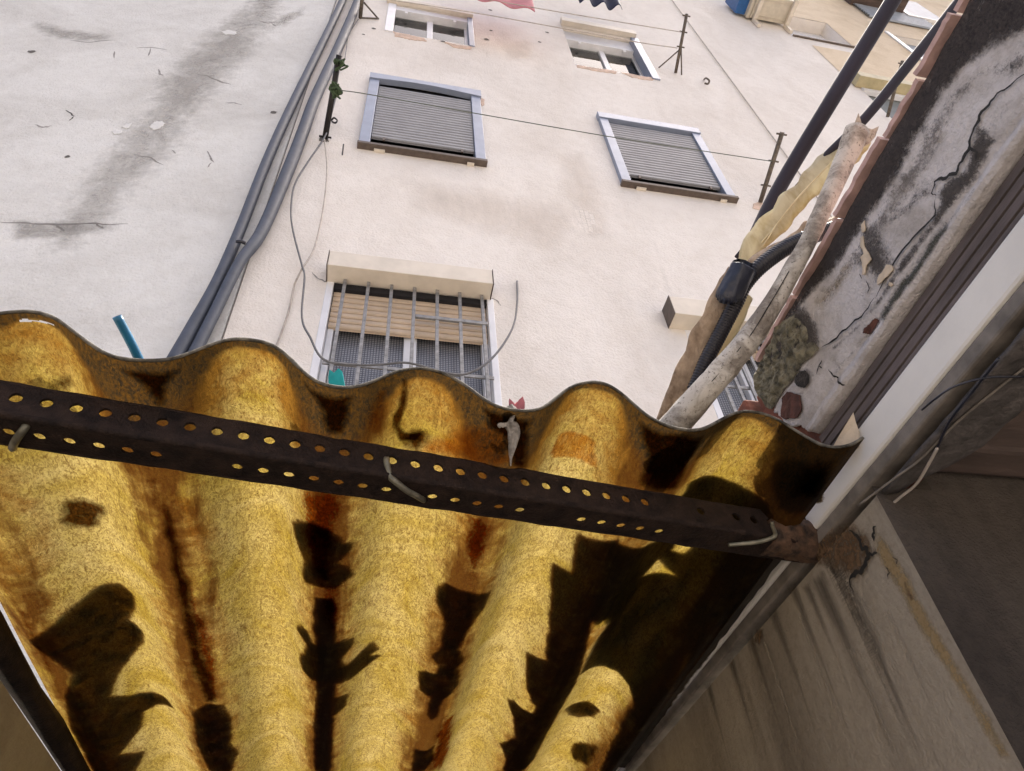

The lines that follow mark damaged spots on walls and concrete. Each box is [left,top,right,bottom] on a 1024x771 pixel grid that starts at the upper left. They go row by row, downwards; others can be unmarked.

water stain [783,0,1024,321]
peeling [860,221,894,287]
crack [816,74,1024,386]
flaking render [863,318,879,334]
flaking render [780,370,809,420]
rust [303,492,341,629]
crack [849,526,898,592]